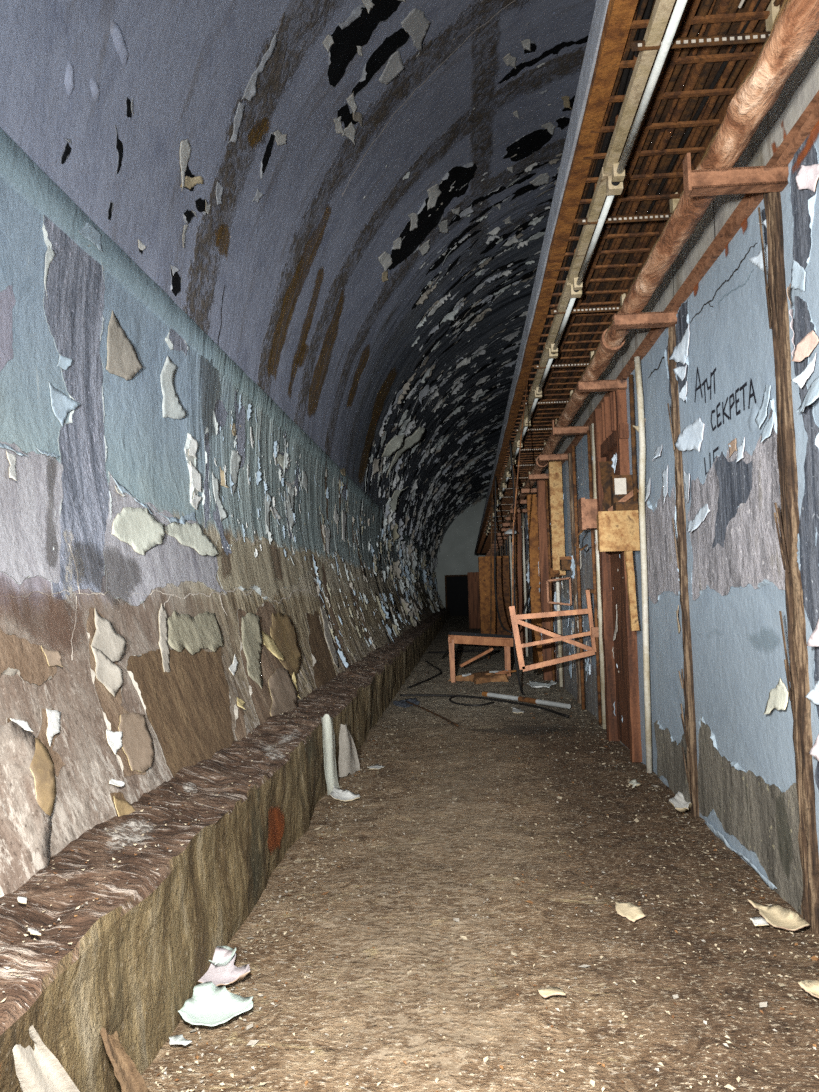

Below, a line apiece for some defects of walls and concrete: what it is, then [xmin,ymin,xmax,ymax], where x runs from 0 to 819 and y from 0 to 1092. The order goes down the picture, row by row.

peeling [228,32,277,143]
peeling [322,0,431,145]
peeling [497,22,589,84]
peeling [748,209,768,275]
peeling [664,299,690,404]
peeling [0,89,575,816]
peeling [645,385,785,633]
peeling [530,520,592,681]
peeling [764,678,789,714]
peeling [0,708,65,897]
peeling [654,716,803,915]